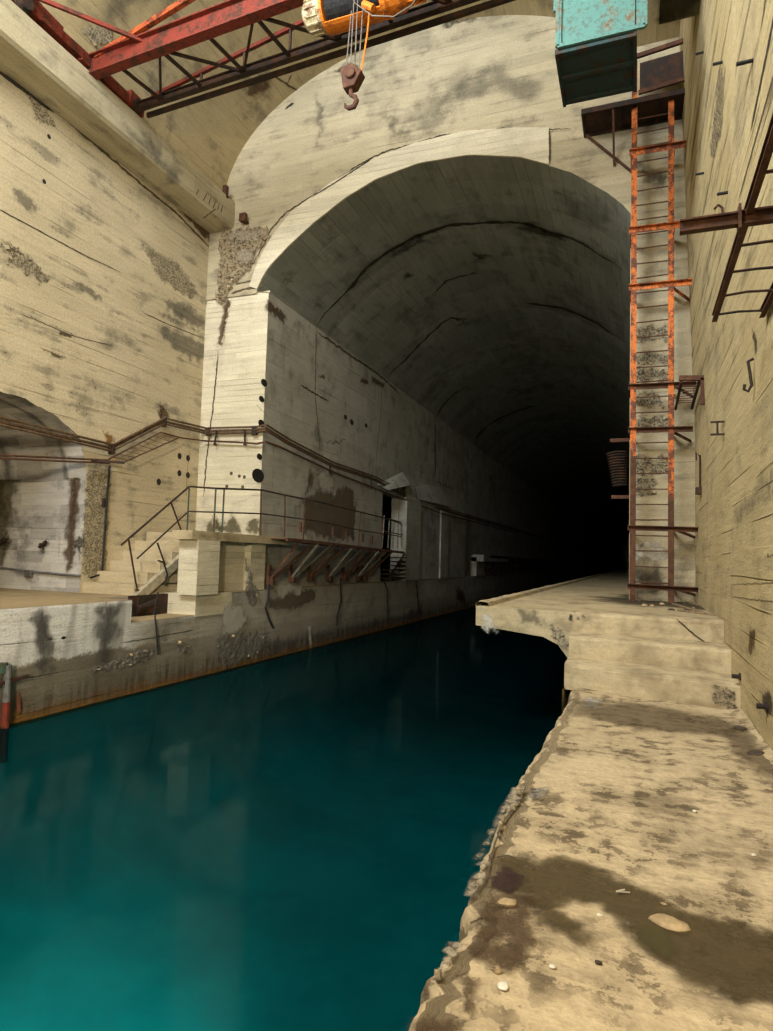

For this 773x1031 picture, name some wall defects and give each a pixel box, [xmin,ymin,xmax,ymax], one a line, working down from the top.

spalling [215,226,271,305]
water stain [0,461,20,566]
spalling [80,464,111,578]
water stain [0,602,494,727]
water stain [496,855,773,1001]